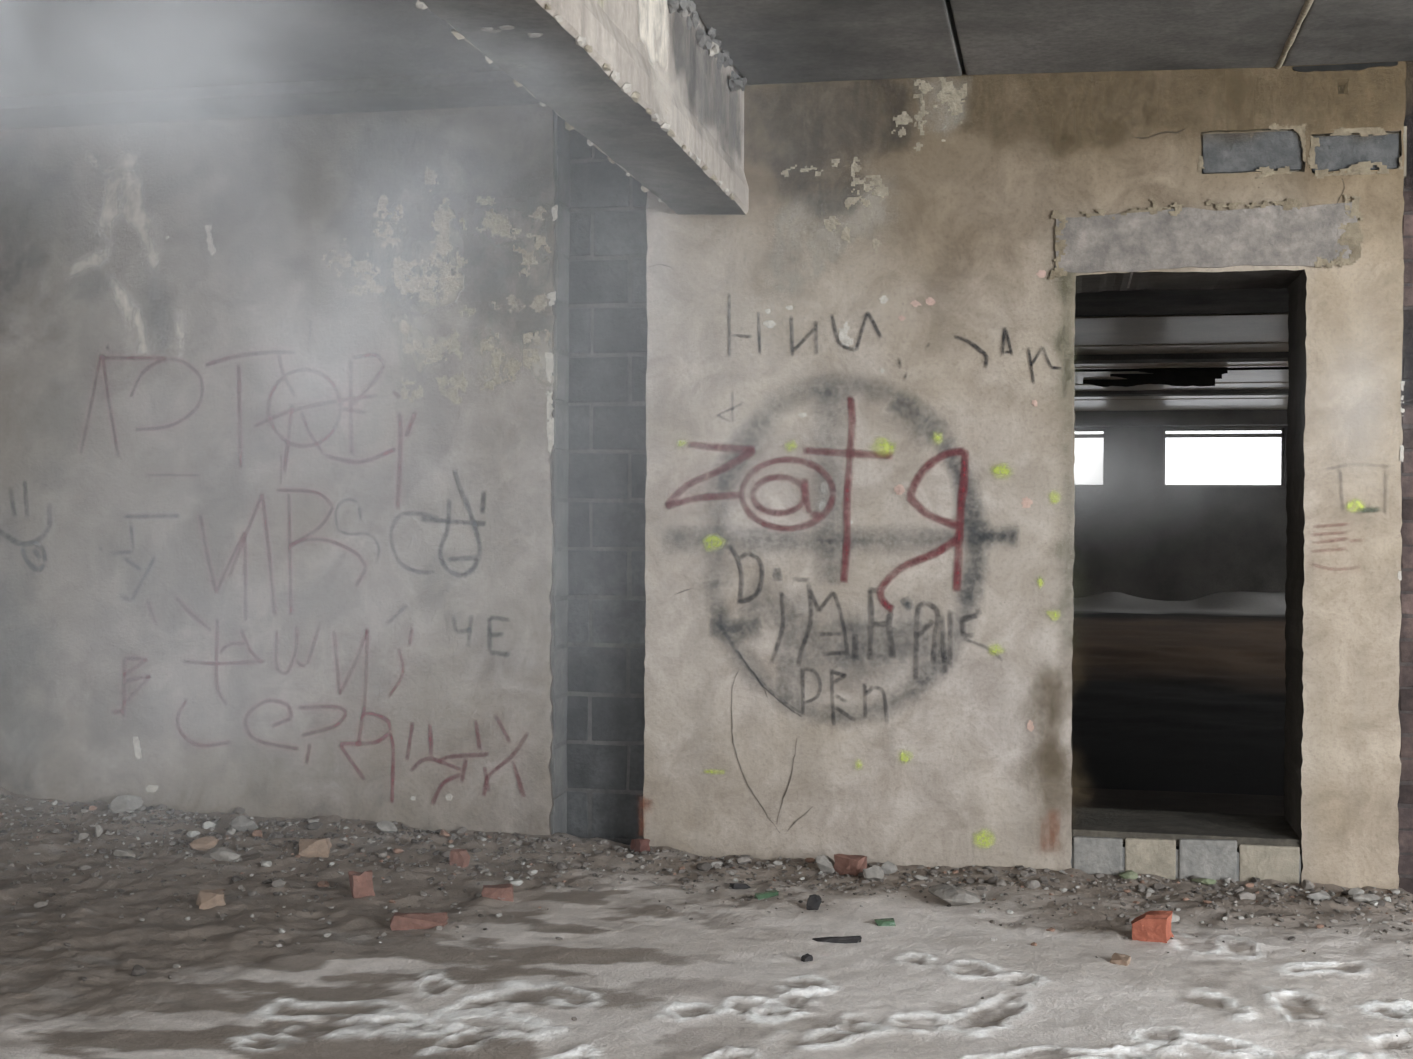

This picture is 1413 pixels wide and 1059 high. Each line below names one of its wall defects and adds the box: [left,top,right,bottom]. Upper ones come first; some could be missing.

spalling [667,0,747,91]
peeling [891,77,967,151]
peeling [781,157,889,243]